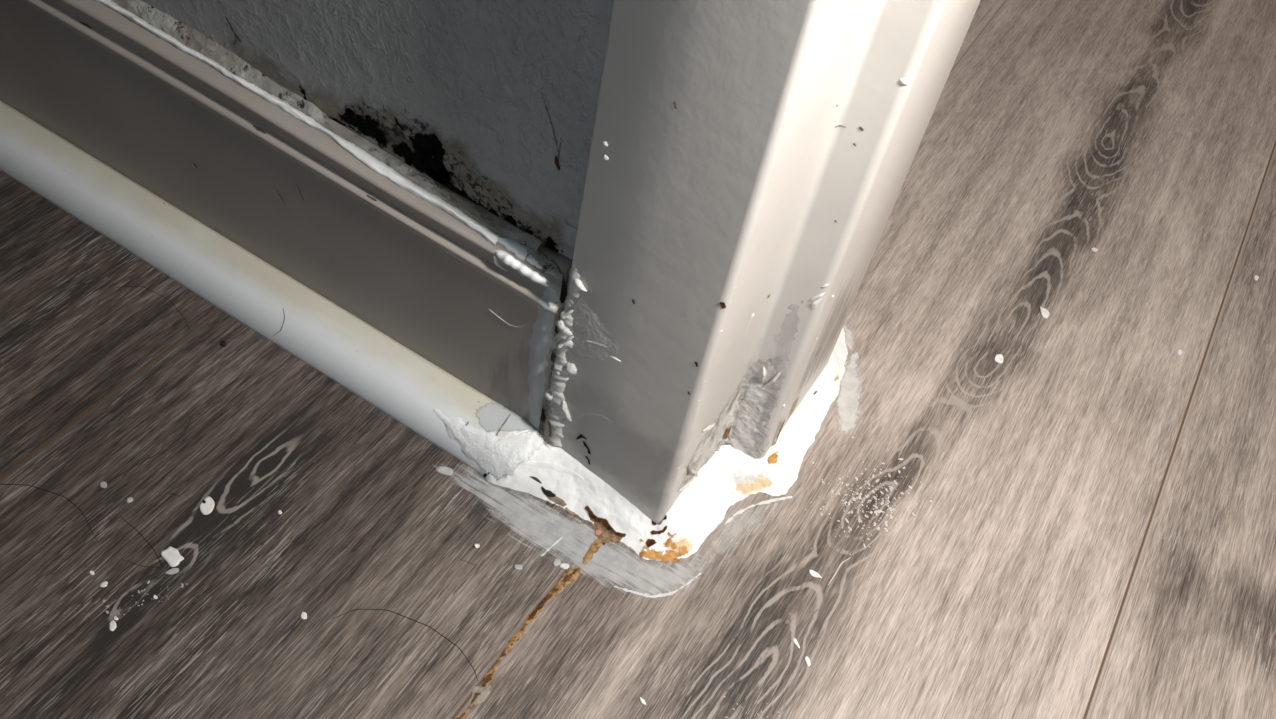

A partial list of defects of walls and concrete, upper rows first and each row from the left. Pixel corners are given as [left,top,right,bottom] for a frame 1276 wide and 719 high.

leakage [235,49,563,253]
corrosion [737,420,785,494]
spalling [541,487,626,545]
corrosion [639,515,691,563]